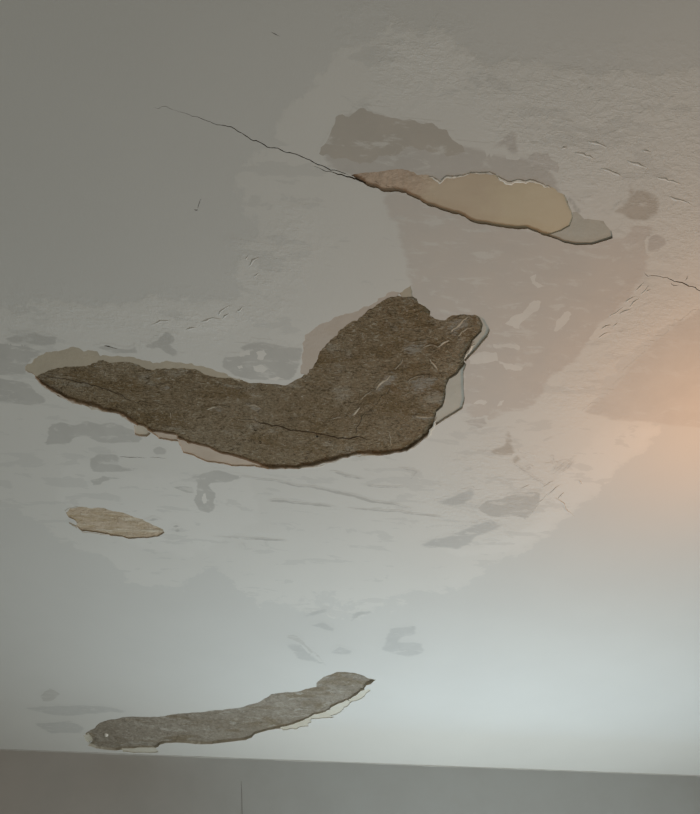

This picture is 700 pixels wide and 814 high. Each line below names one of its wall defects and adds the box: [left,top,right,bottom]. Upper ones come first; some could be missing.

crack [154,106,366,184]
spalling [0,105,670,516]
spalling [66,507,164,539]
spalling [83,672,375,753]